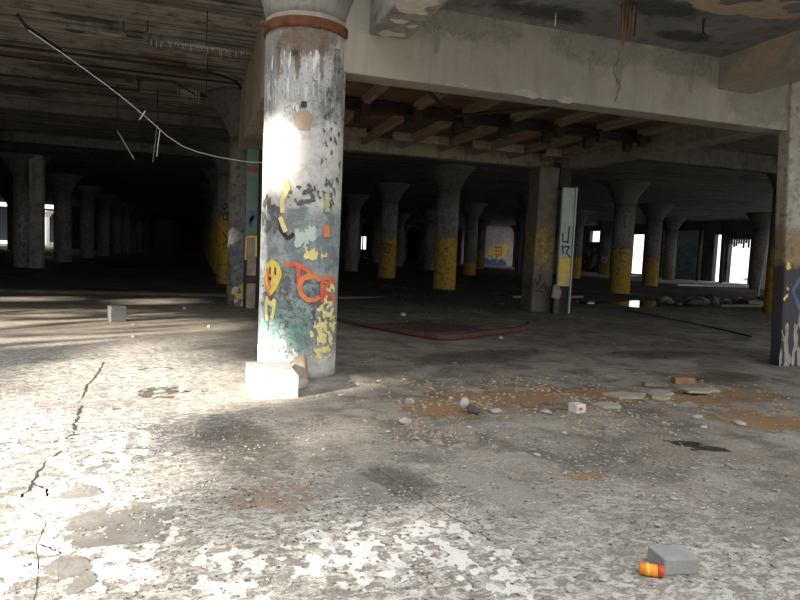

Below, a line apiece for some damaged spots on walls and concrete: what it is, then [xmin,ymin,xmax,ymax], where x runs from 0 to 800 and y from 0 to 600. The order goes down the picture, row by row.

rust [276,26,338,77]
damp [424,9,517,53]
damp [493,0,711,91]
spalling [677,0,800,19]
peeling [268,45,345,164]
peeling [288,162,341,209]
peeling [294,225,327,260]
peeling [255,270,336,364]
crack [18,362,104,600]
peeling [0,407,242,596]
peeling [190,537,277,600]
peeling [266,464,534,600]